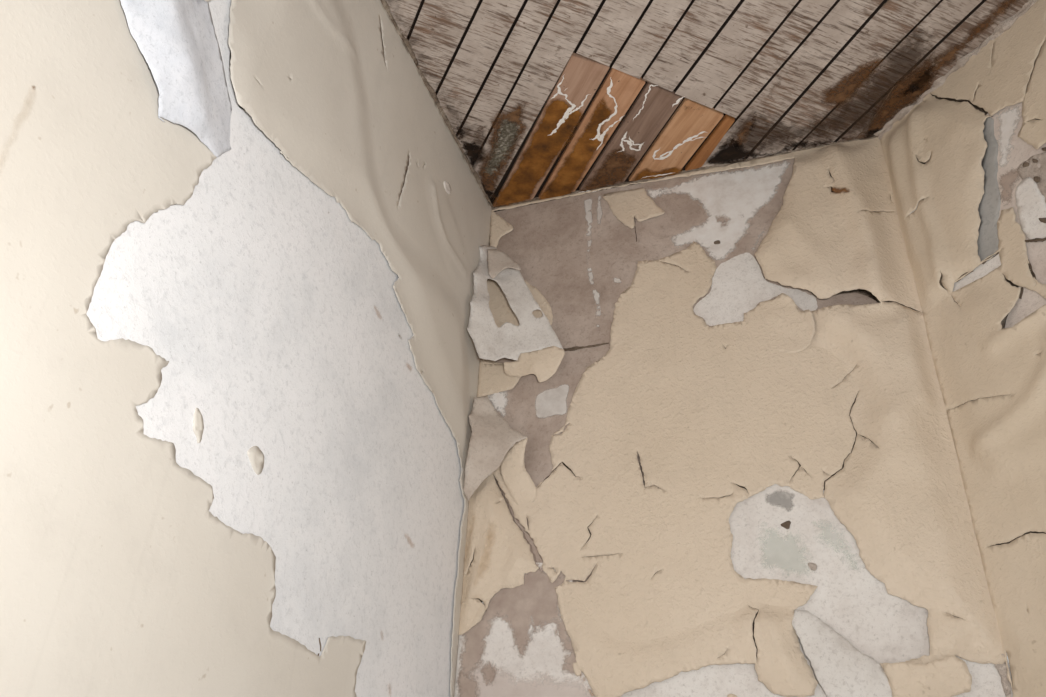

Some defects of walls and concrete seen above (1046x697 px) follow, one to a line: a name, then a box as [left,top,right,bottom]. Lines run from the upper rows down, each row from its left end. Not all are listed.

damp [447,74,707,207]
damp [707,0,1017,164]
peeling [953,102,1046,328]
peeling [86,0,595,697]
peeling [477,158,878,487]
crack [494,476,543,570]
crack [566,520,612,582]
crack [637,452,661,489]
peeling [729,484,930,679]
crack [791,374,879,499]
peeling [620,637,827,697]
peeling [952,653,1013,697]